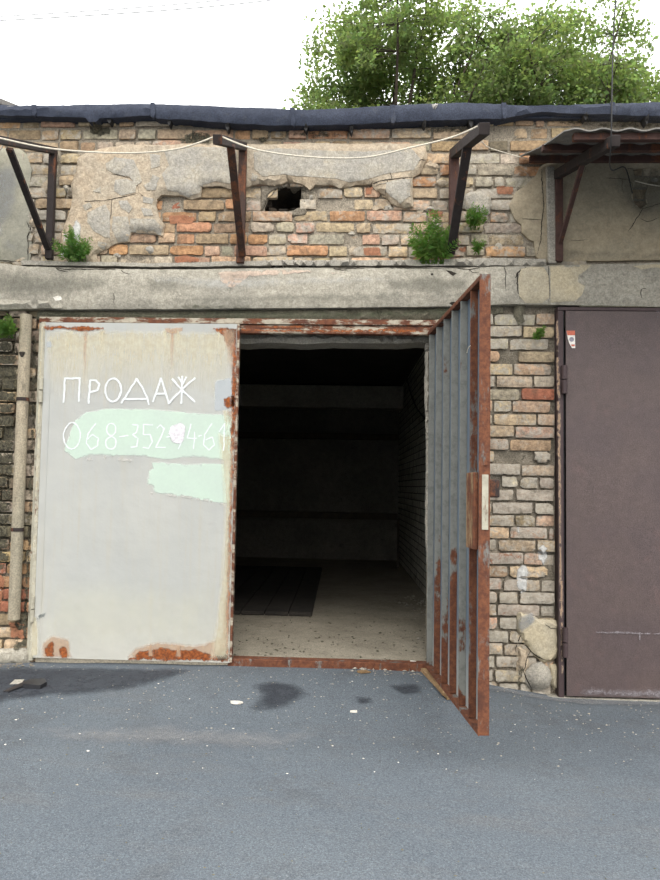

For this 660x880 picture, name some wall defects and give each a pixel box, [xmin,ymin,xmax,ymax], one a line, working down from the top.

crack [85,174,143,216]
spalling [0,146,591,326]
corrosion [128,326,422,662]